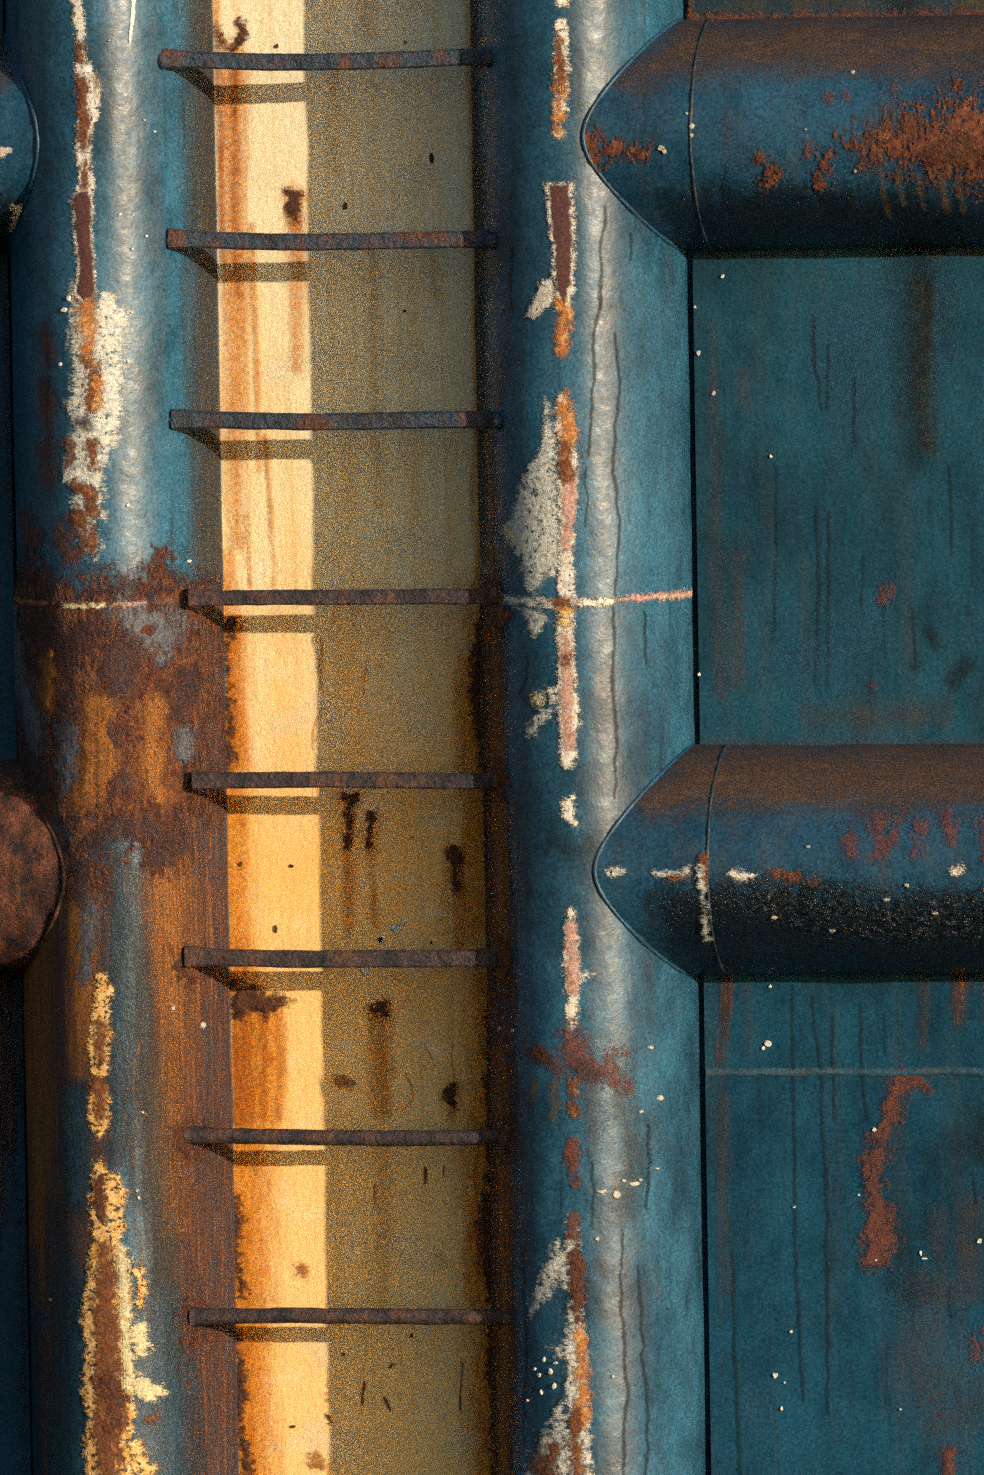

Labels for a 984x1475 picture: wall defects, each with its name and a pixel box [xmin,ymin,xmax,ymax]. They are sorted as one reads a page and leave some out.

peeling [550,0,572,140]
corrosion [620,2,984,208]
peeling [58,0,133,560]
corrosion [283,186,306,365]
peeling [525,181,578,359]
peeling [500,387,692,770]
corrosion [0,0,297,1475]
corrosion [445,288,633,1475]
corrosion [638,743,984,861]
peeling [77,972,169,1475]
peeling [524,1211,600,1475]
corrosion [856,1066,934,1273]